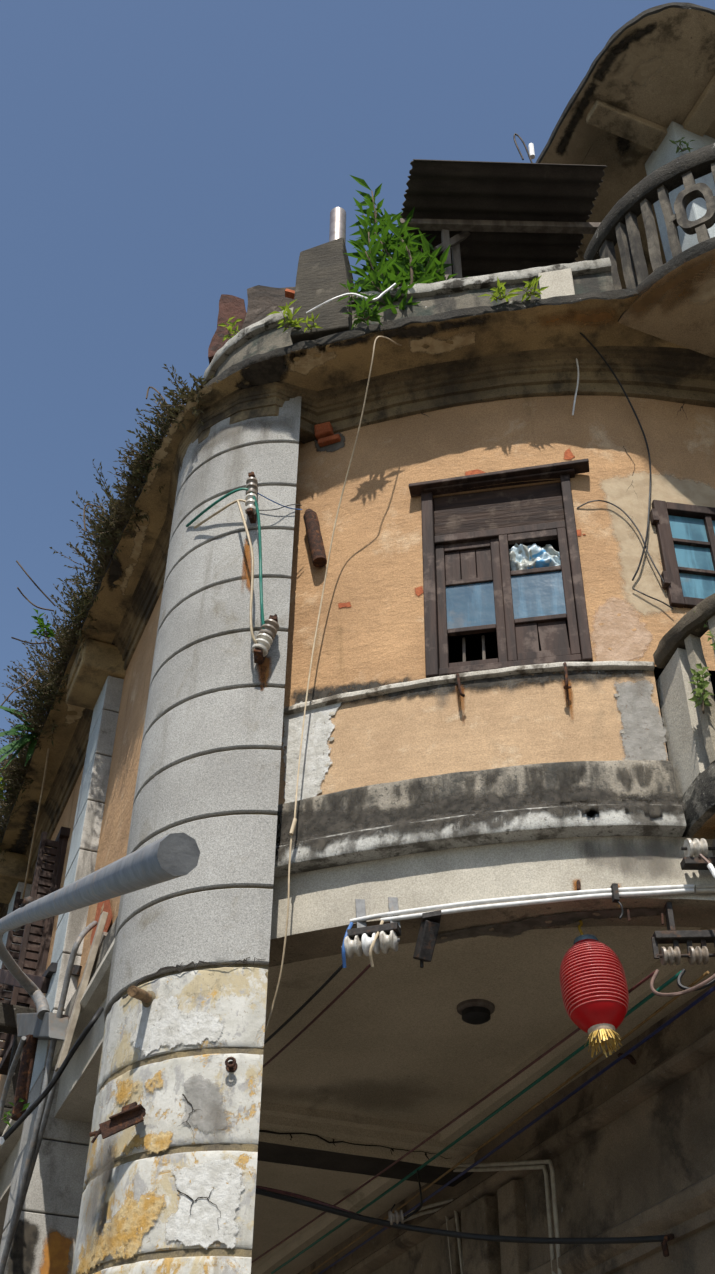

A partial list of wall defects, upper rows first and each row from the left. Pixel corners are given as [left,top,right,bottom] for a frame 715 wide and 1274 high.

damp [556,24,656,155]
corrosion [243,539,251,591]
corrosion [257,657,270,690]
peeling [282,702,342,803]
damp [275,764,683,861]
peeling [130,996,224,1055]
peeling [108,1071,229,1164]
peeling [78,1158,245,1274]
crack [177,1187,221,1230]